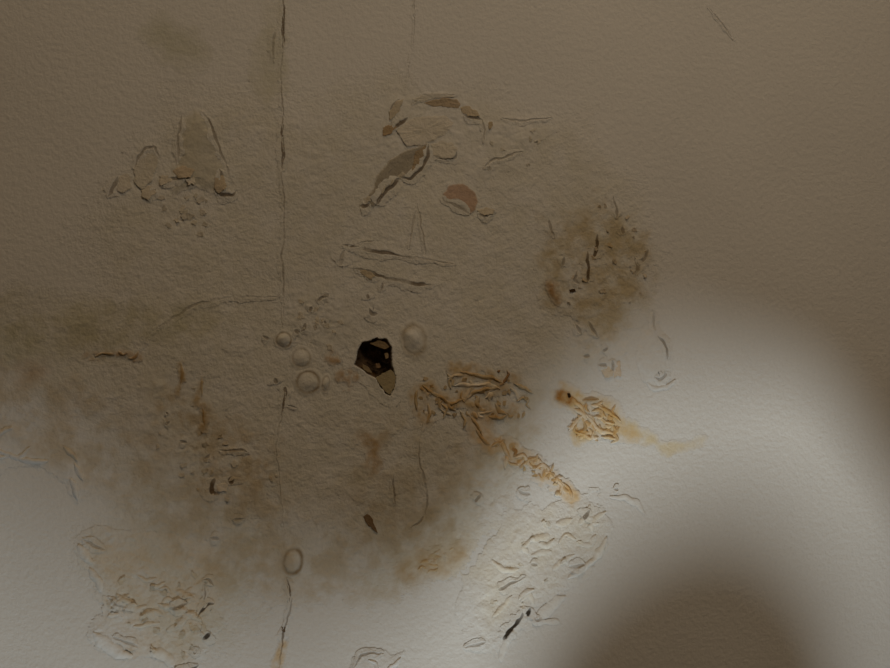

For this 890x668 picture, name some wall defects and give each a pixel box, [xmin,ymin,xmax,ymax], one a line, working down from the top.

peeling [103,108,239,237]
flaking render [360,143,436,216]
flaking render [440,183,496,223]
damp [0,8,676,668]
peeling [376,370,396,394]
corrosion [407,358,582,503]
corrosion [549,380,709,458]
peeling [73,525,225,668]
crack [277,578,295,668]
peeling [455,484,646,662]